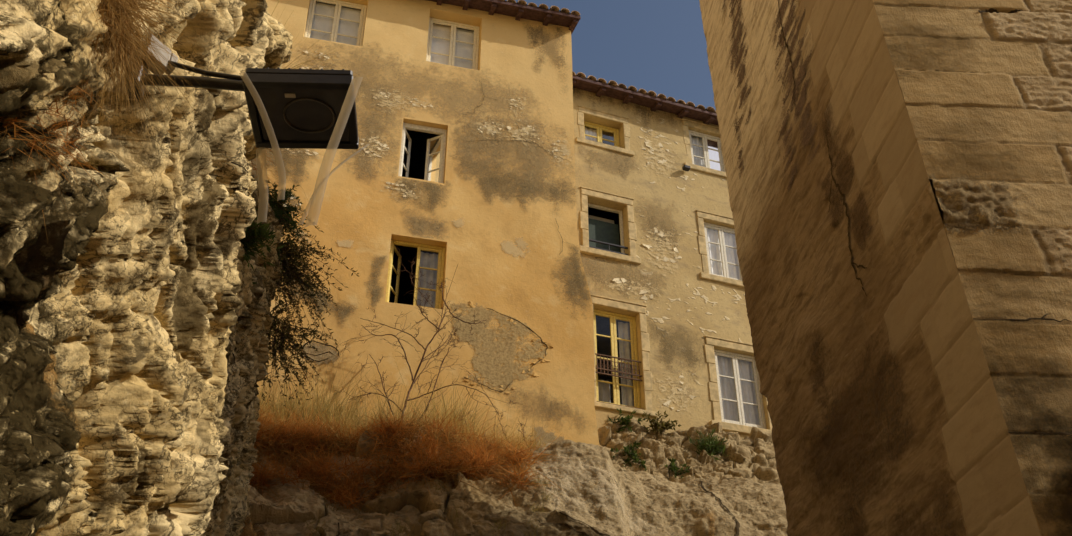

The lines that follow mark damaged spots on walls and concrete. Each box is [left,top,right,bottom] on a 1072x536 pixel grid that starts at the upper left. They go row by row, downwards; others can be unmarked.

crack [978,6,1023,14]
damp [313,46,575,207]
flaking render [449,301,553,394]
damp [555,247,663,308]
flaking render [600,226,683,304]
spalling [699,0,1041,536]
crack [973,313,1072,322]
damp [987,360,1072,536]